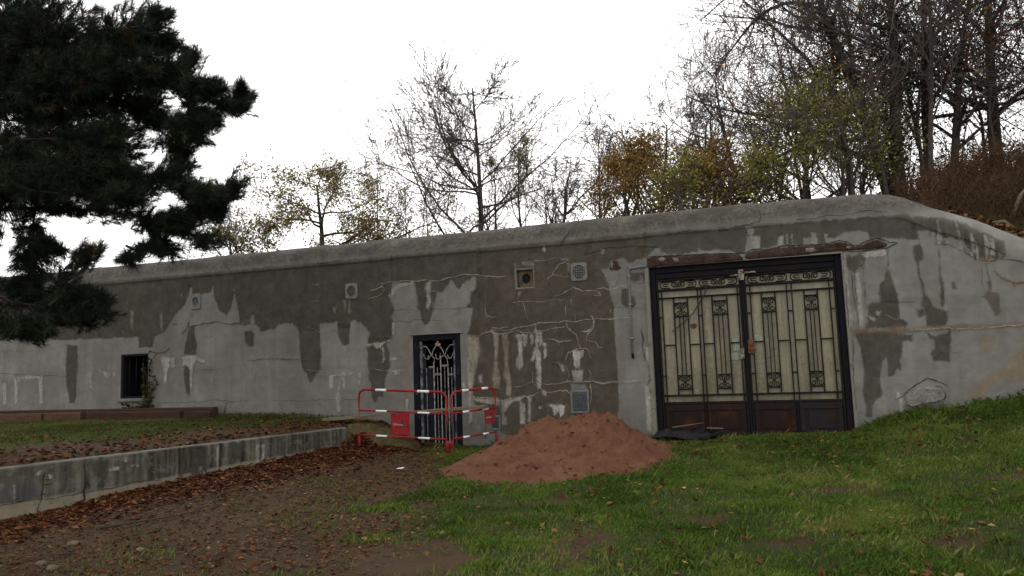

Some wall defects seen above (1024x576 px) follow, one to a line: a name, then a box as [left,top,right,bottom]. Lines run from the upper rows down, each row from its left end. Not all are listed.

damp [0,214,1006,436]
crack [369,208,1024,403]